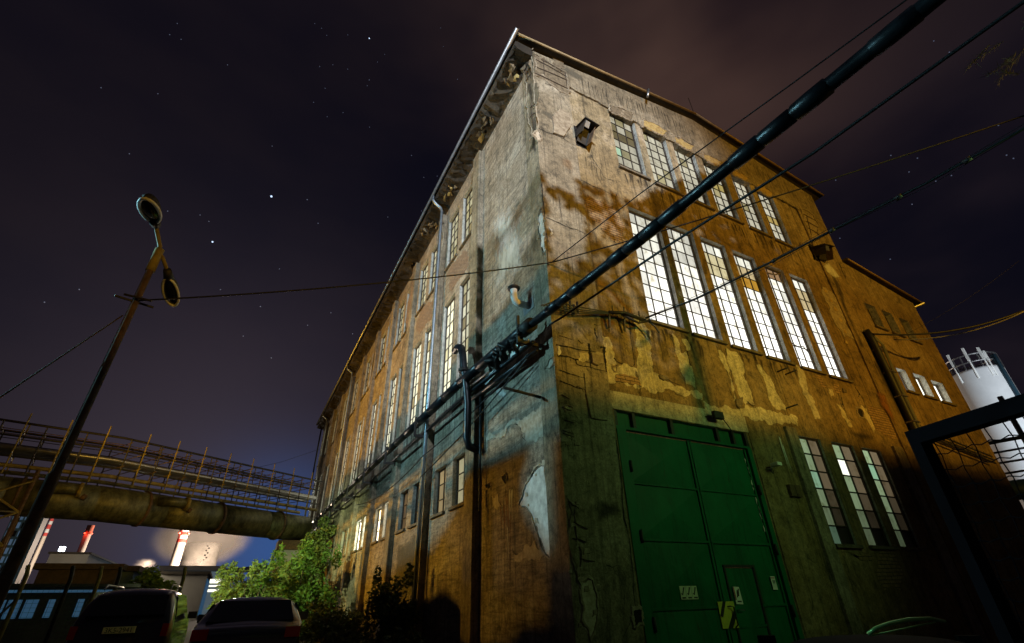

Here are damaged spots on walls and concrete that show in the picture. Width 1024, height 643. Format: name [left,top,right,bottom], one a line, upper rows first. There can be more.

peeling [602,314,798,426]
peeling [512,460,550,562]